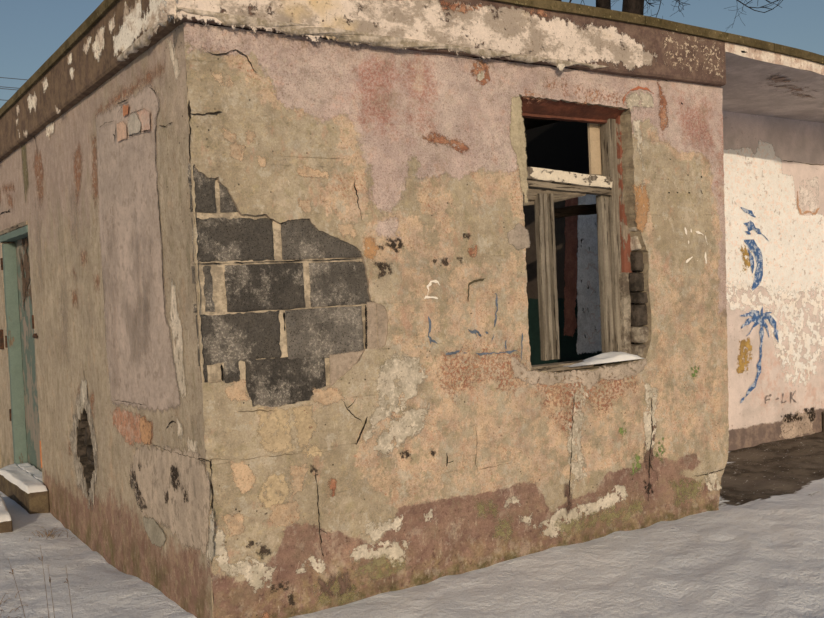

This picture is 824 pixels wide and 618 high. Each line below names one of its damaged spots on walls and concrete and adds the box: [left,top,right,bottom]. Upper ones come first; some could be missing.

peeling [83,15,115,60]
peeling [16,77,48,139]
spalling [187,162,388,527]
spalling [69,380,98,511]
crack [156,445,331,509]
crack [315,472,327,558]
peeling [363,353,431,459]
peeling [502,484,628,539]
water stain [564,484,572,513]
crack [568,395,576,495]
crack [648,398,658,501]
water stain [318,572,351,596]